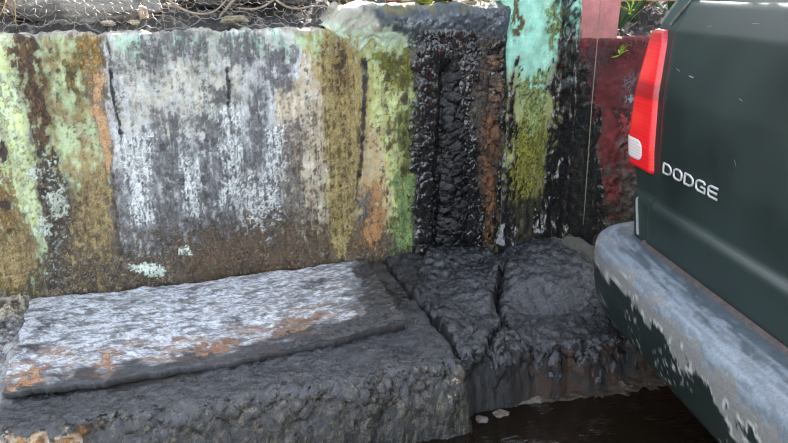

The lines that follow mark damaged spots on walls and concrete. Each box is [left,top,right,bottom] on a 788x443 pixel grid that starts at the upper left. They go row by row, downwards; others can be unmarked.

corrosion [90,72,113,174]
water stain [0,28,428,298]
water stain [431,0,554,254]
corrosion [6,364,49,392]
corrosion [194,337,239,357]
corrosion [272,312,319,337]